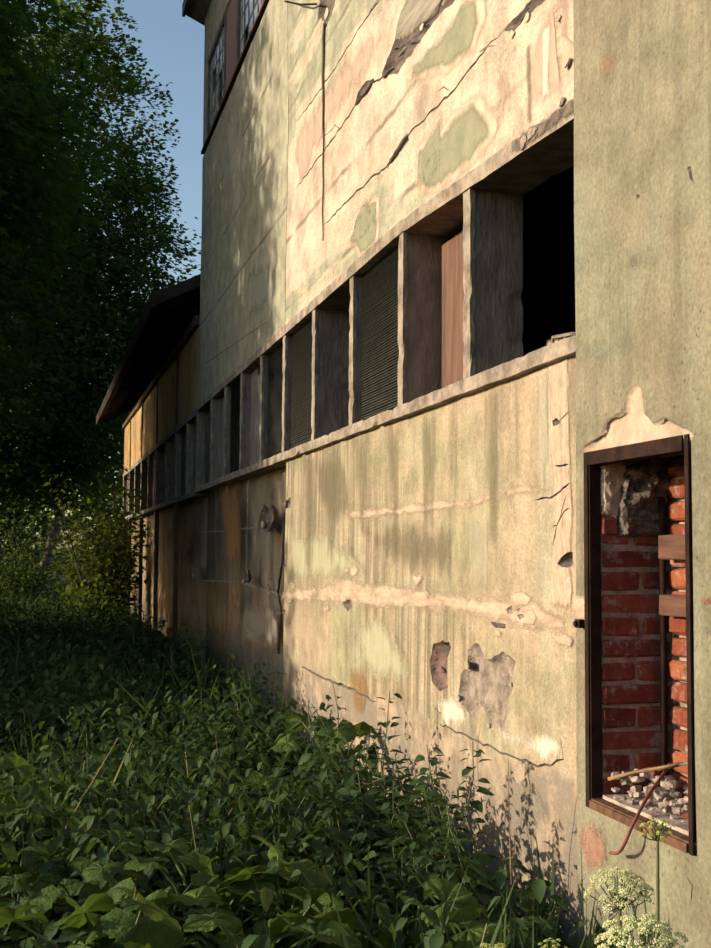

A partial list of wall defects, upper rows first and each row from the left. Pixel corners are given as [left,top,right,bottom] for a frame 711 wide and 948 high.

peeling [382,0,486,82]
flaking render [504,0,545,39]
crack [324,31,503,225]
flaking render [584,382,694,452]
leakage [318,464,346,514]
peeling [282,358,584,646]
crack [537,464,571,545]
crack [197,443,291,654]
leakage [292,535,359,578]
leakage [377,530,450,569]
flaking render [430,640,516,734]
crack [439,724,564,819]